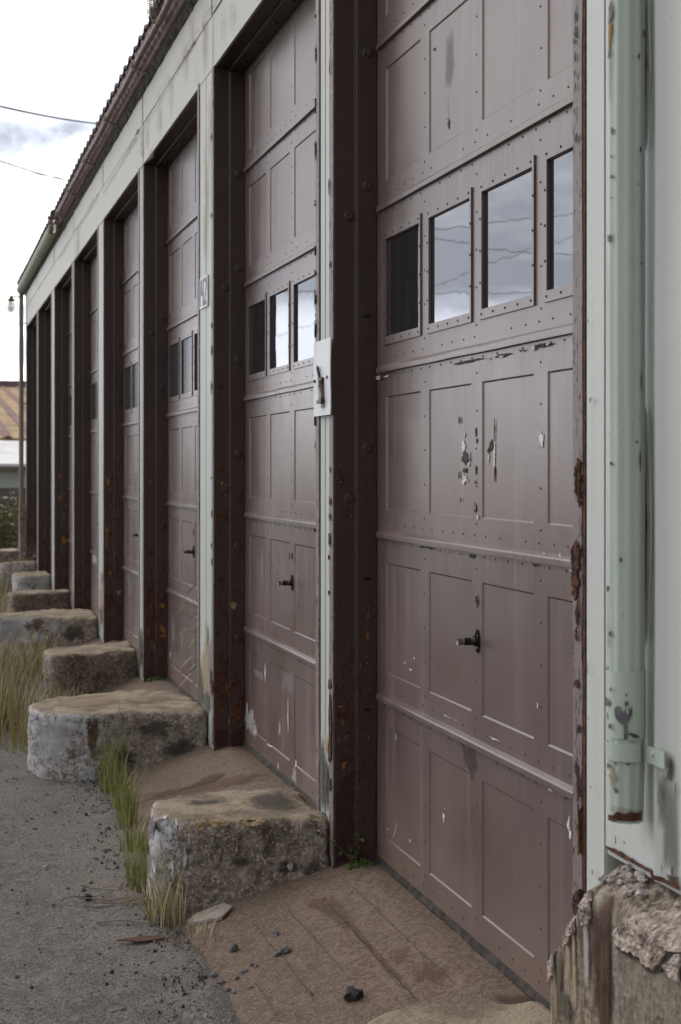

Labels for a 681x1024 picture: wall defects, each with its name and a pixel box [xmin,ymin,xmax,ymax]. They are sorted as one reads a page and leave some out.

peeling [454,343,553,365]
corrosion [215,452,243,536]
peeling [458,416,496,502]
corrosion [573,458,583,508]
corrosion [570,540,583,641]
corrosion [215,670,243,724]
corrosion [328,679,354,770]
peeling [604,687,640,740]
corrosion [608,811,642,822]
corrosion [605,846,680,891]
spalling [546,864,681,984]